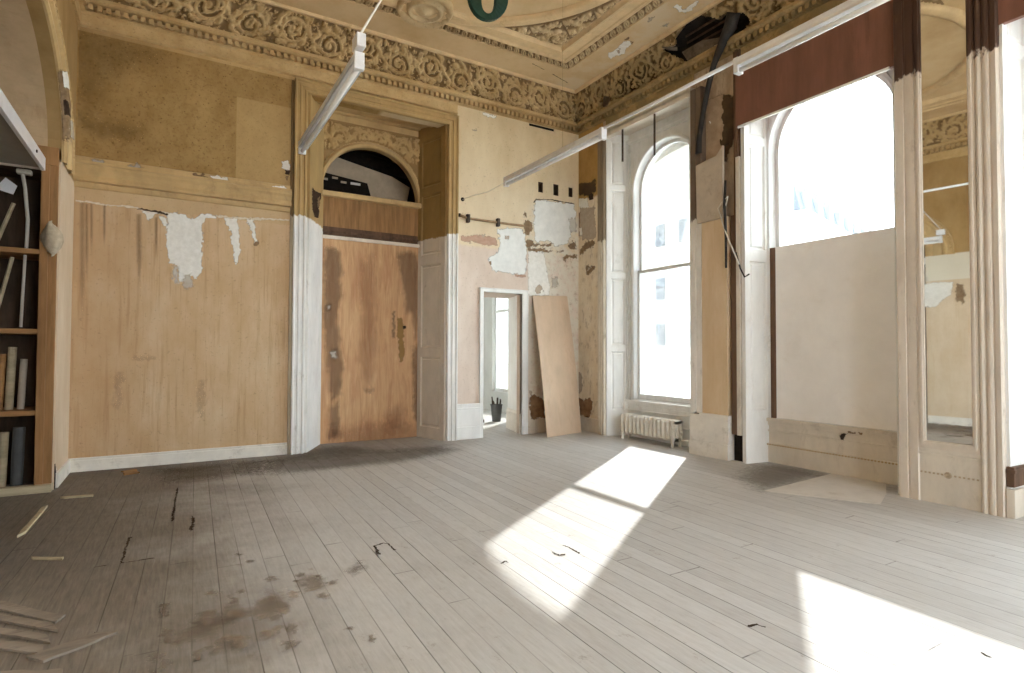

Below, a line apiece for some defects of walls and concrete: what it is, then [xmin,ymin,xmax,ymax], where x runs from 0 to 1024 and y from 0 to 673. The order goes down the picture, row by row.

peeling [142,211,259,288]
flaking render [461,193,596,296]
damp [325,250,341,395]
damp [392,254,418,413]
spalling [529,391,545,420]
spalling [579,372,593,418]
damp [153,574,335,668]